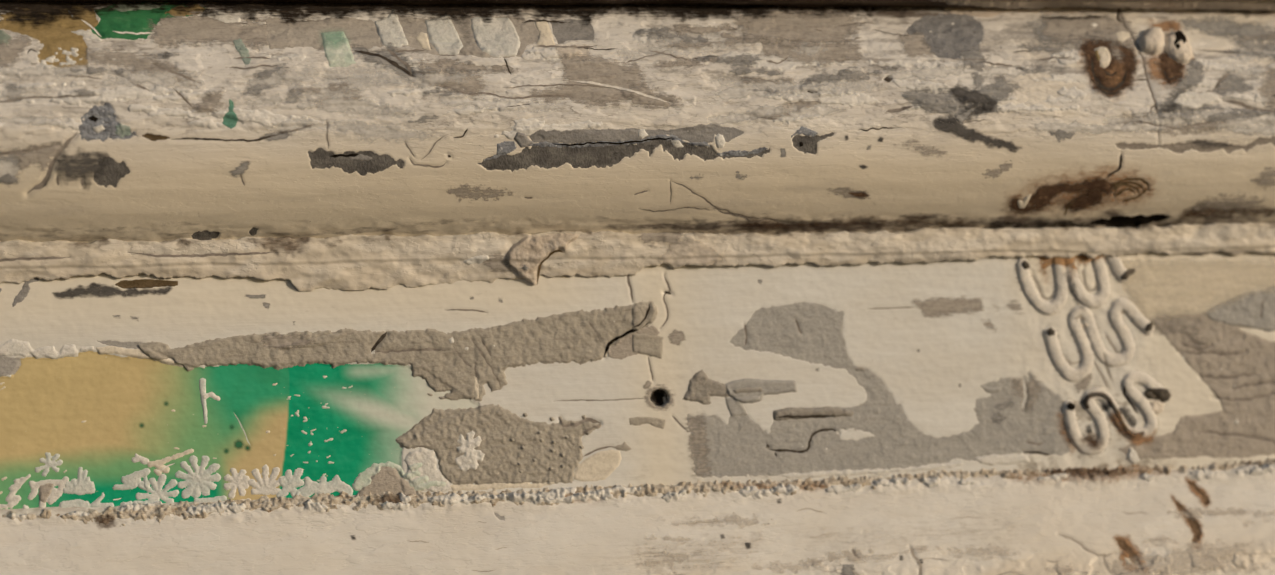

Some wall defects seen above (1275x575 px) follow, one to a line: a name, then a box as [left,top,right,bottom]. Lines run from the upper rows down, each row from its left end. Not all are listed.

peeling [0,2,879,188]
peeling [869,13,1275,154]
corrosion [1080,38,1194,97]
crack [641,181,813,224]
corrosion [1010,153,1153,216]
crack [560,273,671,401]
peeling [0,339,650,523]
corrosion [1101,403,1153,445]
peeling [738,454,1030,500]
corrosion [1186,479,1210,506]
corrosion [1171,497,1203,548]
corrosion [1114,536,1149,573]